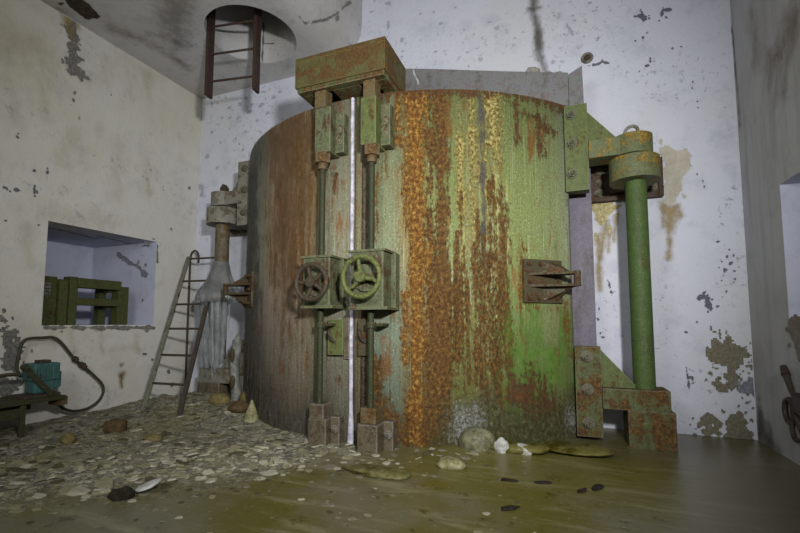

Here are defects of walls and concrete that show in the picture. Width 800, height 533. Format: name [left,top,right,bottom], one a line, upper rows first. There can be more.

peeling [59,0,100,82]
water stain [531,0,543,64]
peeling [634,7,672,22]
peeling [116,238,159,278]
peeling [697,290,728,313]
peeling [0,308,33,372]
peeling [689,326,755,440]